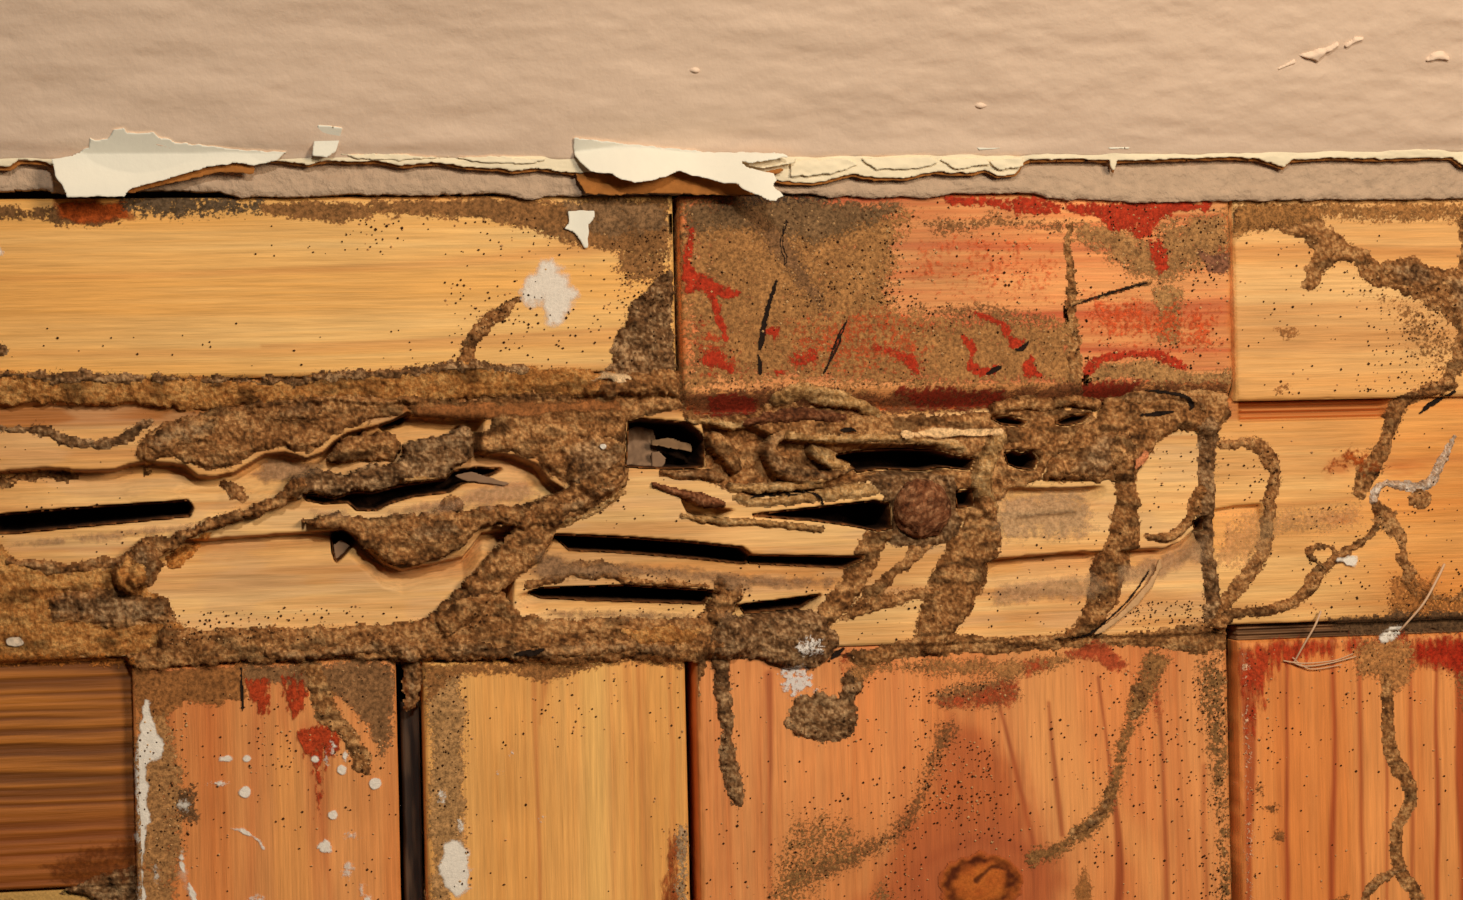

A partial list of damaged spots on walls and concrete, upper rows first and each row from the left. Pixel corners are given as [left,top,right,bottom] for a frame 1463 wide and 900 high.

spalling [0,125,1463,248]
crack [757,220,788,375]
crack [823,320,847,374]